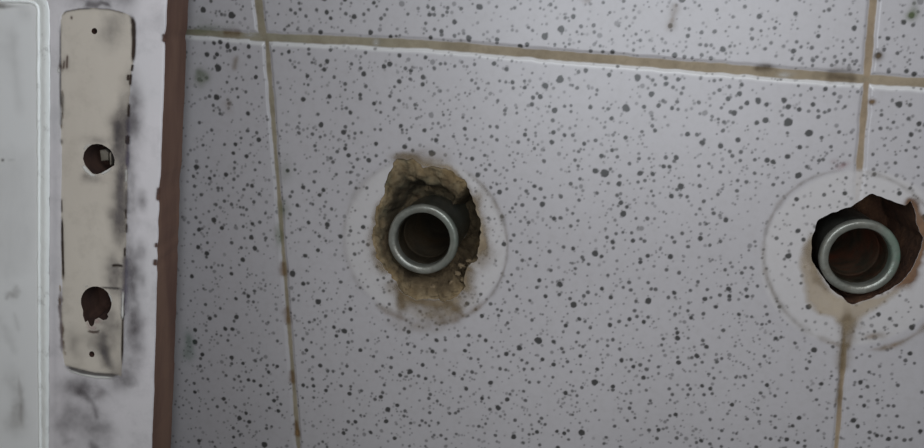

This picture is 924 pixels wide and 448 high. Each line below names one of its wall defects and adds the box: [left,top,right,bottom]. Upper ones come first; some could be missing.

spalling [372,156,487,308]
spalling [813,194,924,304]